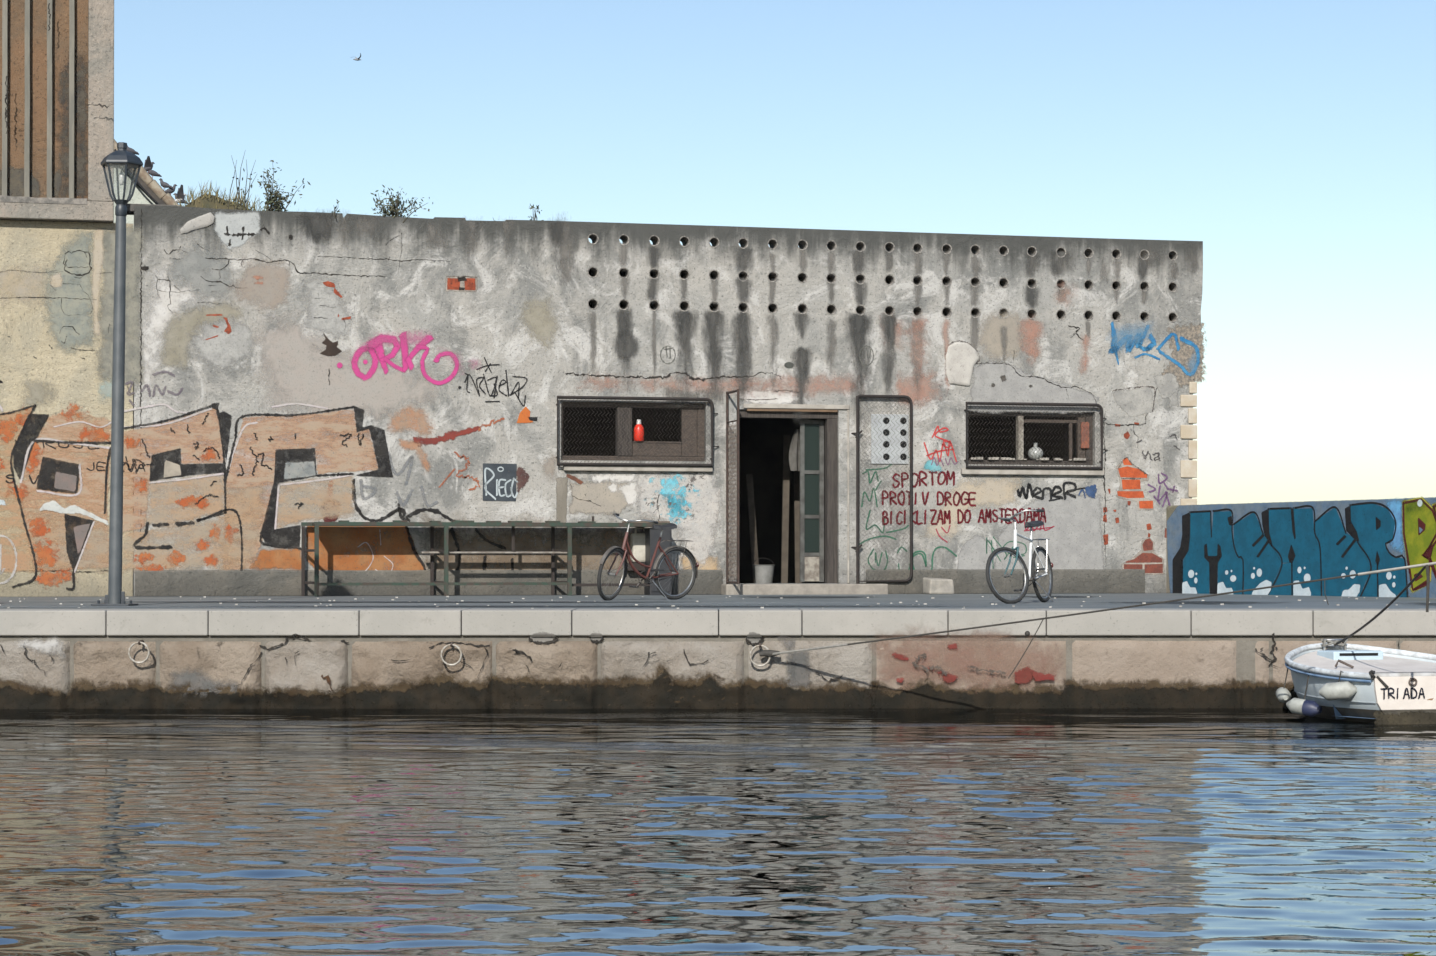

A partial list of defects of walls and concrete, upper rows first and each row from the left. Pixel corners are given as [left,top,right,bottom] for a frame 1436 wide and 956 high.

water stain [616,243,659,370]
water stain [666,247,752,403]
water stain [768,254,778,364]
water stain [795,314,810,404]
water stain [828,251,894,394]
water stain [970,257,980,349]
peeling [970,314,1098,414]
water stain [1001,251,1069,359]
water stain [1138,252,1156,303]
spalling [1162,323,1207,388]
peeling [928,458,1167,575]
water stain [171,671,237,695]